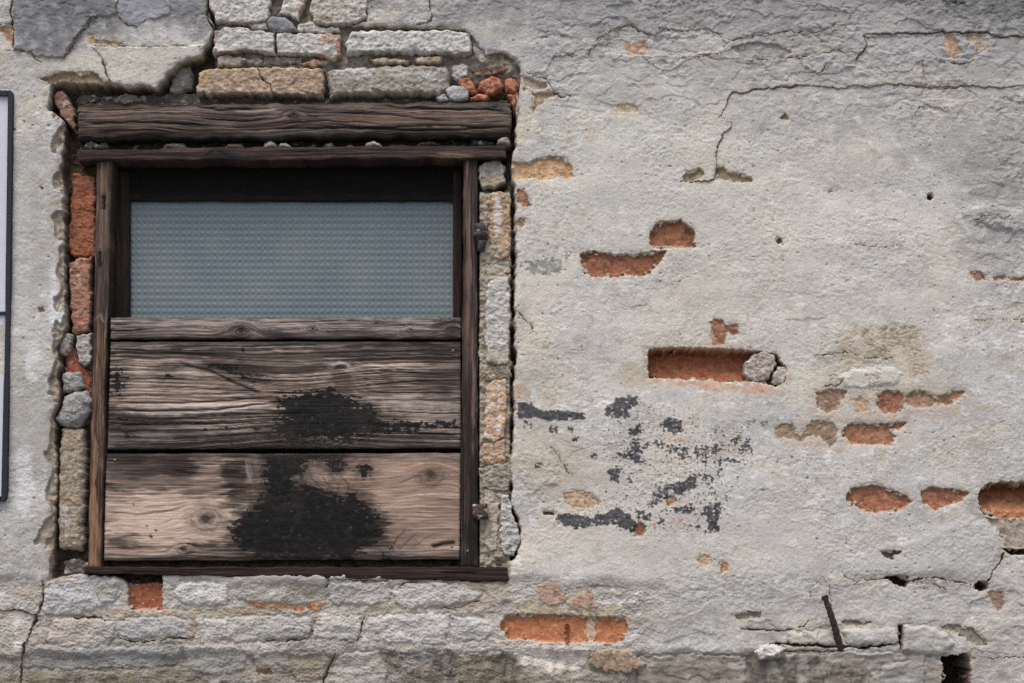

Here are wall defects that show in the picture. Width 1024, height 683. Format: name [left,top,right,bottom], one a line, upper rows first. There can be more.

crack [527,24,1024,183]
spalling [0,0,699,615]
flaking render [555,317,967,537]
spalling [498,580,648,676]
crack [741,552,1005,654]
flaking render [844,479,1024,613]